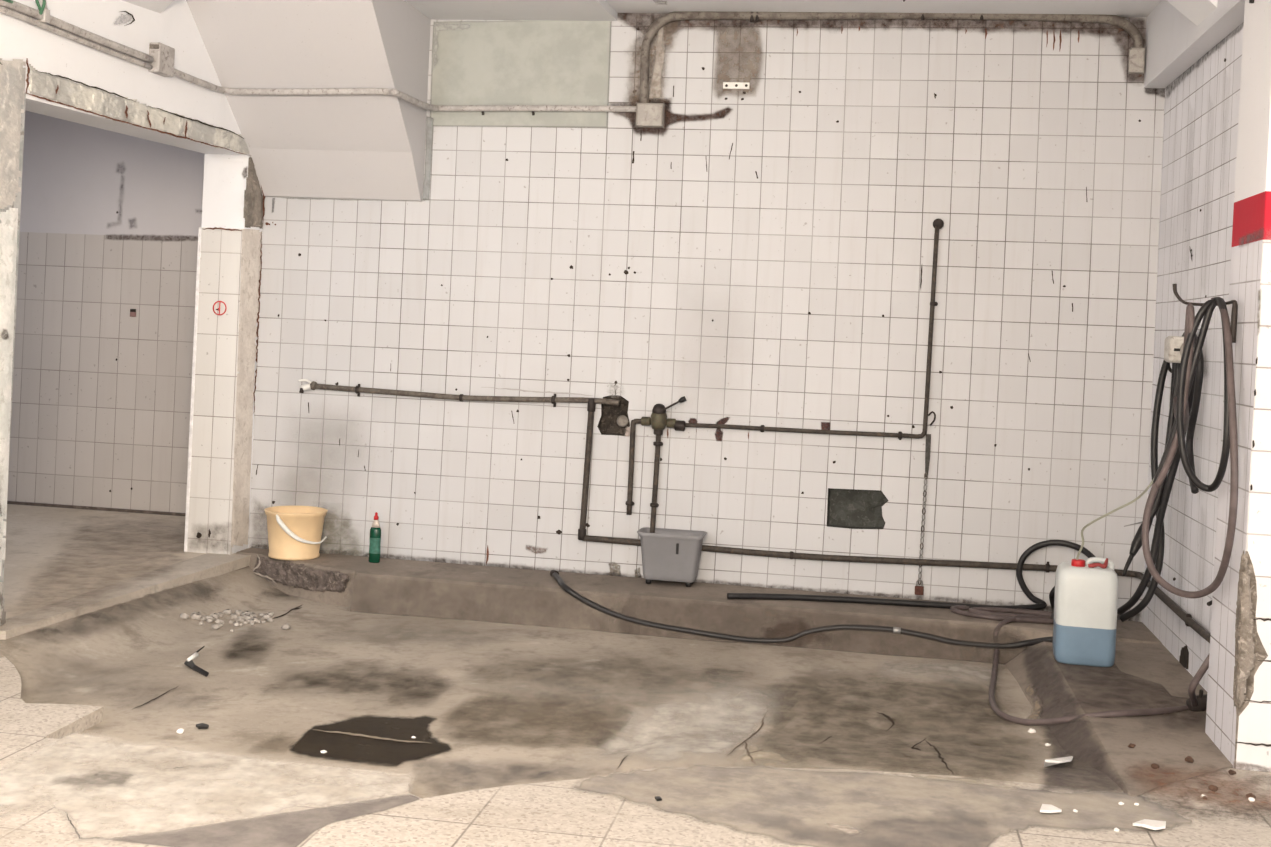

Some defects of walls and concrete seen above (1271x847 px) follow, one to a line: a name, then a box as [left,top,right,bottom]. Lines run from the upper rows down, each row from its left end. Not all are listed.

leakage [716,28,761,96]
spalling [0,58,265,626]
spalling [1233,551,1256,708]
rust [1131,767,1271,809]